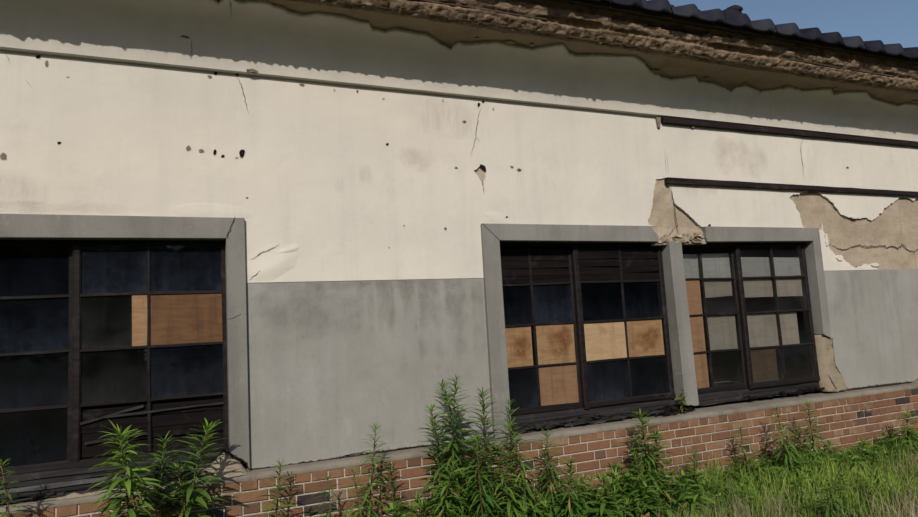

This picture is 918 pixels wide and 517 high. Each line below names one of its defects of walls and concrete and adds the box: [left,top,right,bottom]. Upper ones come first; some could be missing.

flaking render [266,0,918,105]
spalling [474,165,486,191]
spalling [648,178,711,246]
spalling [790,191,918,270]
spalling [29,488,125,504]
spalling [141,453,248,488]